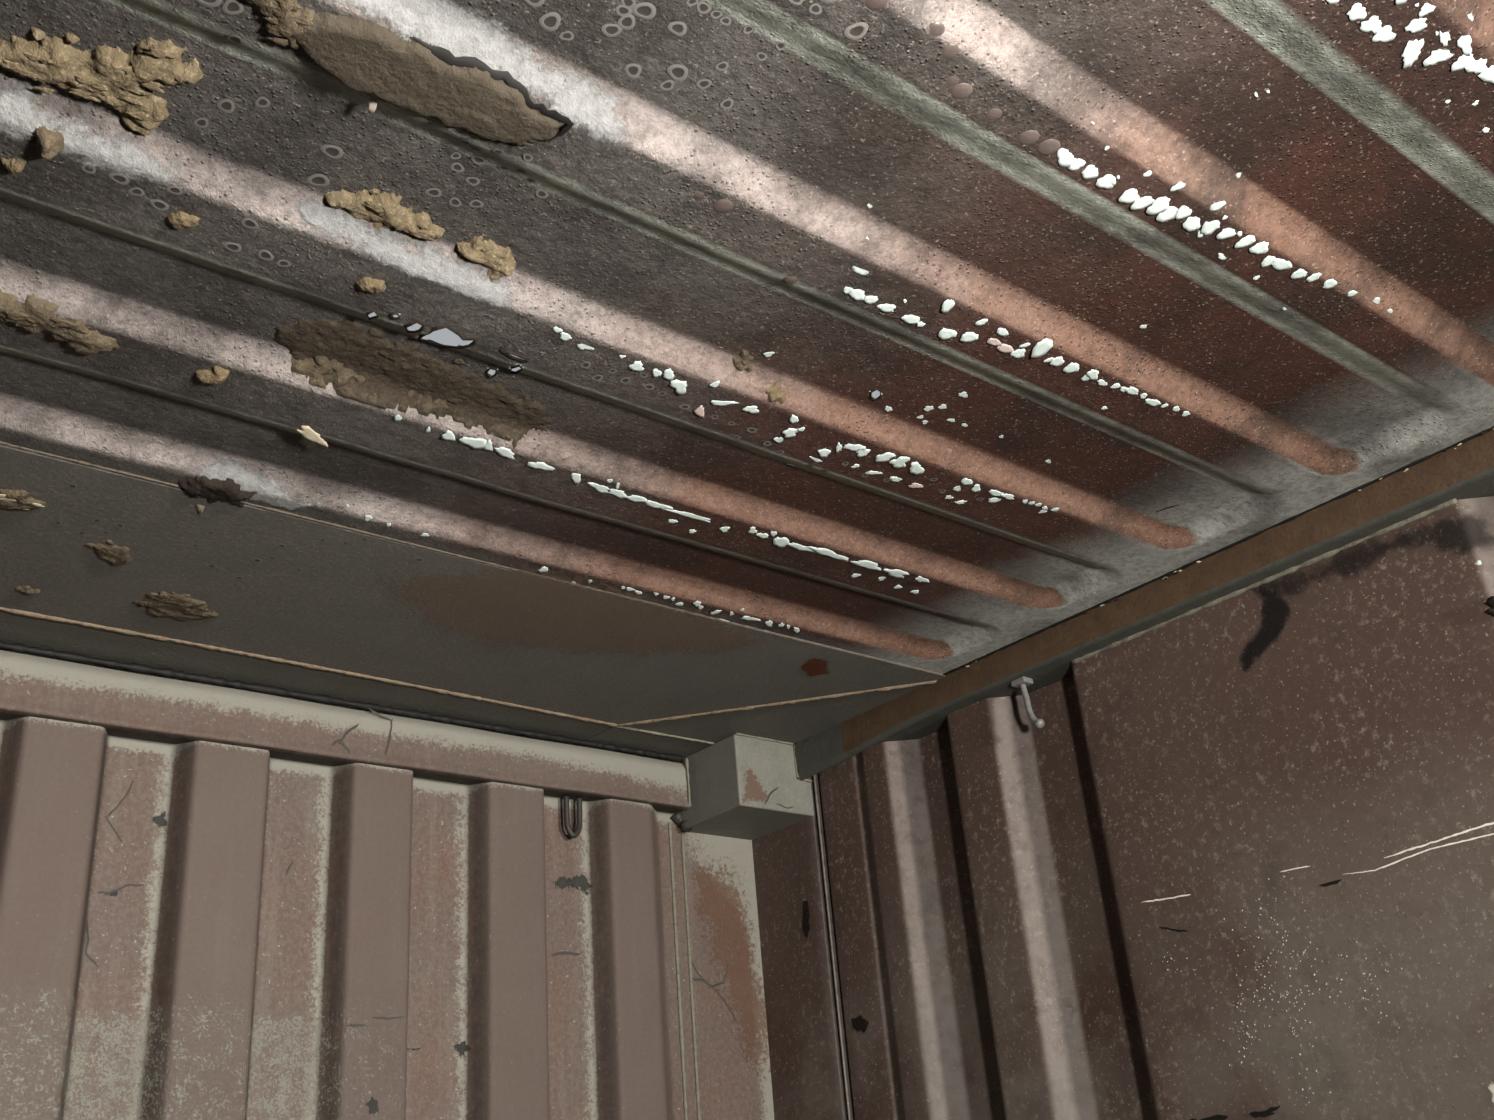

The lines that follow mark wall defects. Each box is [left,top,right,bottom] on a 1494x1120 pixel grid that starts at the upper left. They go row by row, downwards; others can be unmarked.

peeling [0,53,182,183]
peeling [335,0,625,146]
peeling [284,352,366,389]
peeling [394,390,730,534]
peeling [748,527,930,594]
water stain [1212,876,1402,1098]